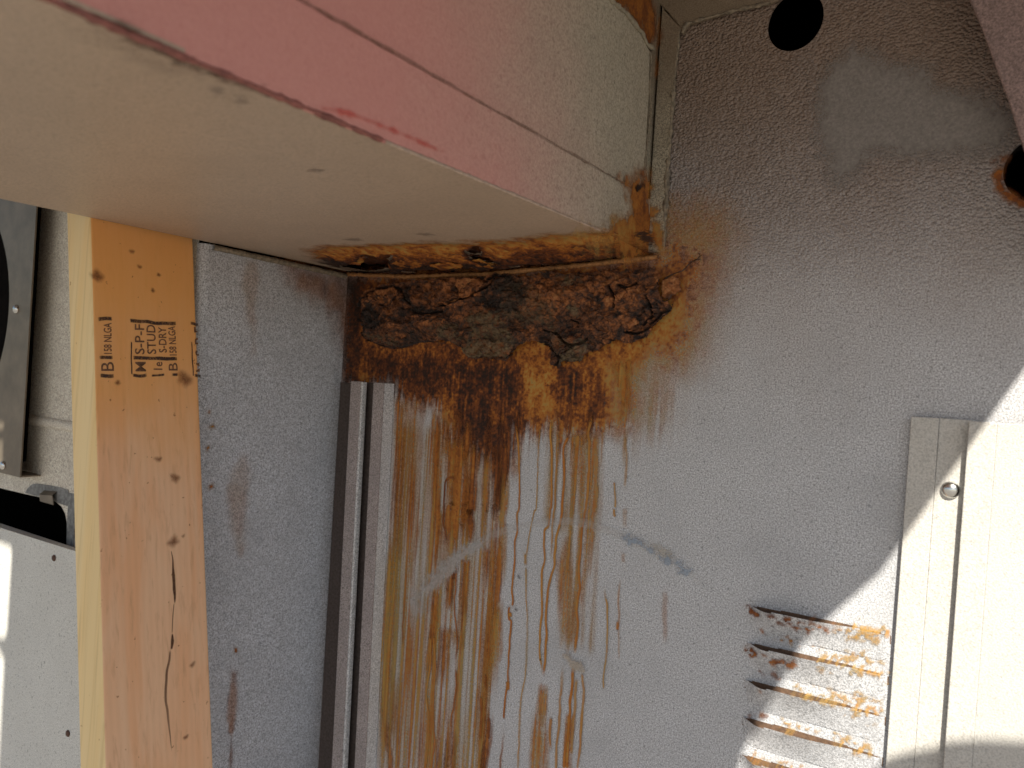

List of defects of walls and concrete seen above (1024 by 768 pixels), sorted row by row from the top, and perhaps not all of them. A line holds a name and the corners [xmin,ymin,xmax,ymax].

rust [992,155,1024,207]
rust [308,170,718,768]
rust [744,607,890,680]
rust [795,686,883,718]
rust [834,732,872,754]